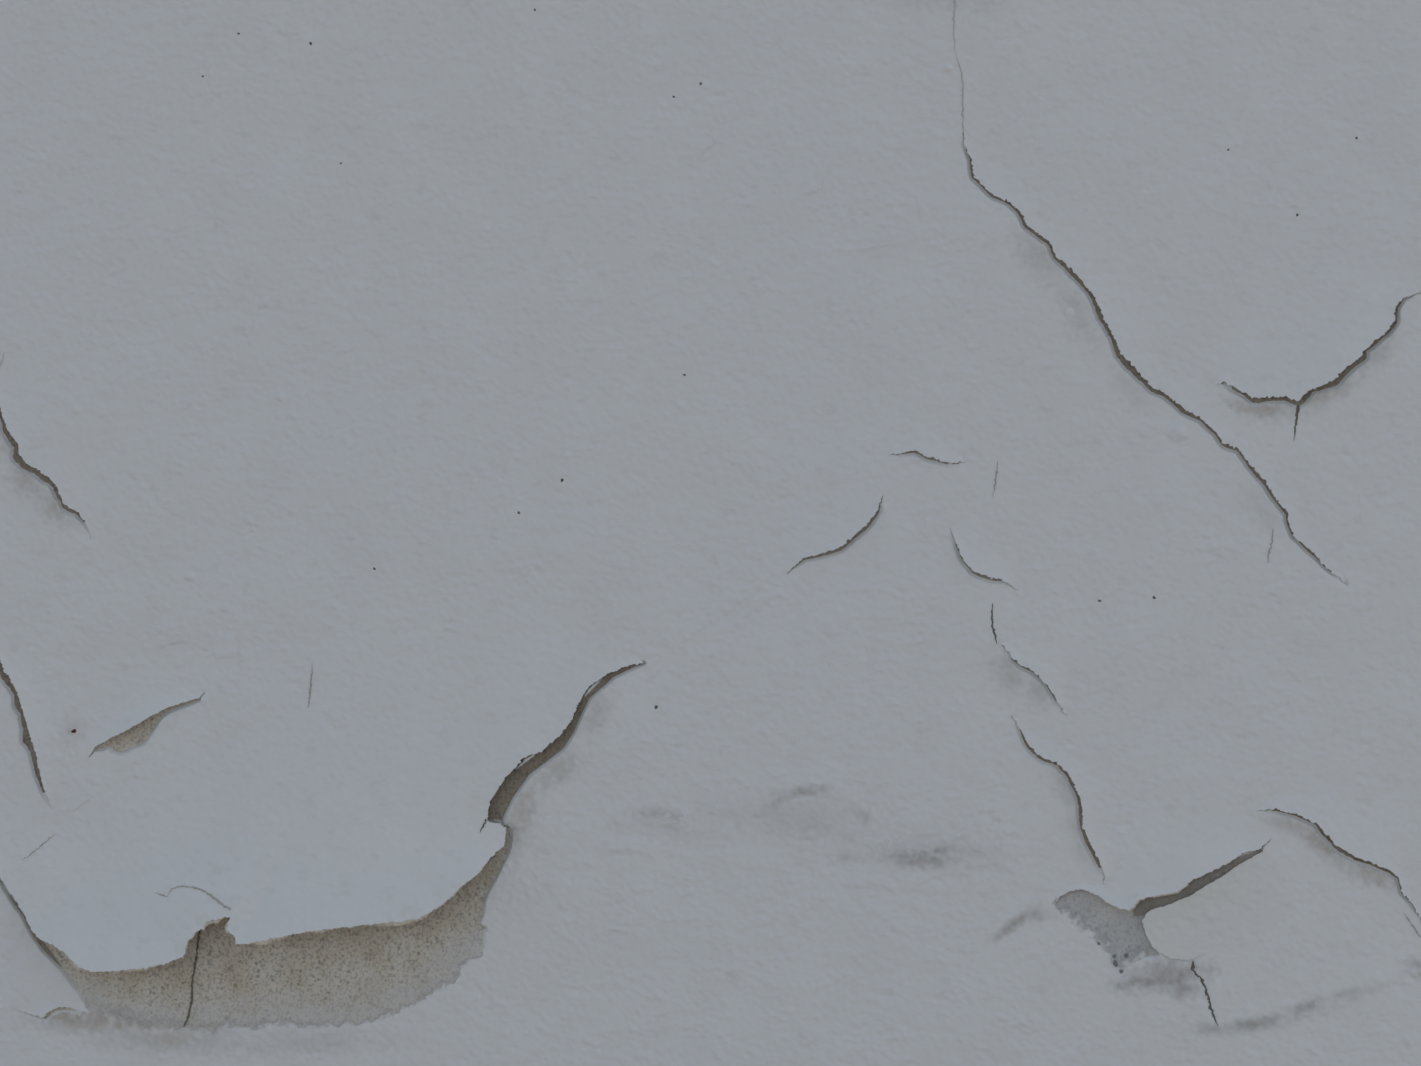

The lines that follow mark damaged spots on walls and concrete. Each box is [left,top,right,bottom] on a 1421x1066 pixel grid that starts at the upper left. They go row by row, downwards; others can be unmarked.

crack [952,0,1348,585]
peeling [0,623,644,1029]
crack [991,603,1075,715]
peeling [1011,715,1421,1025]